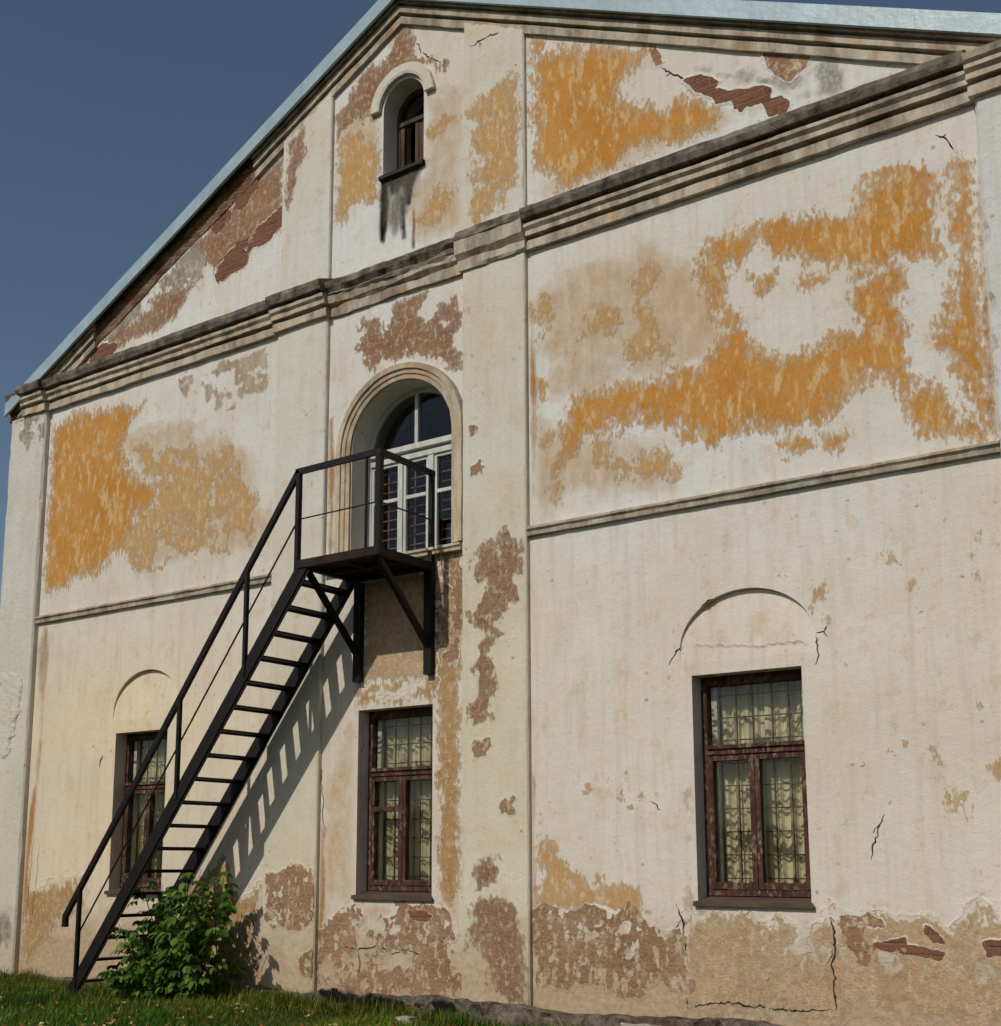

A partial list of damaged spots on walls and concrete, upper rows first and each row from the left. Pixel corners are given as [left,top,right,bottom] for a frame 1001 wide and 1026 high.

peeling [426,37,814,225]
flaking render [81,127,308,366]
peeling [414,181,458,228]
flaking render [355,289,463,375]
peeling [529,291,555,341]
peeling [536,152,998,506]
peeling [14,398,260,595]
crack [669,625,828,665]
flaking render [181,525,1001,1026]
crack [871,815,884,857]
crack [675,905,687,951]
crack [686,917,837,1012]